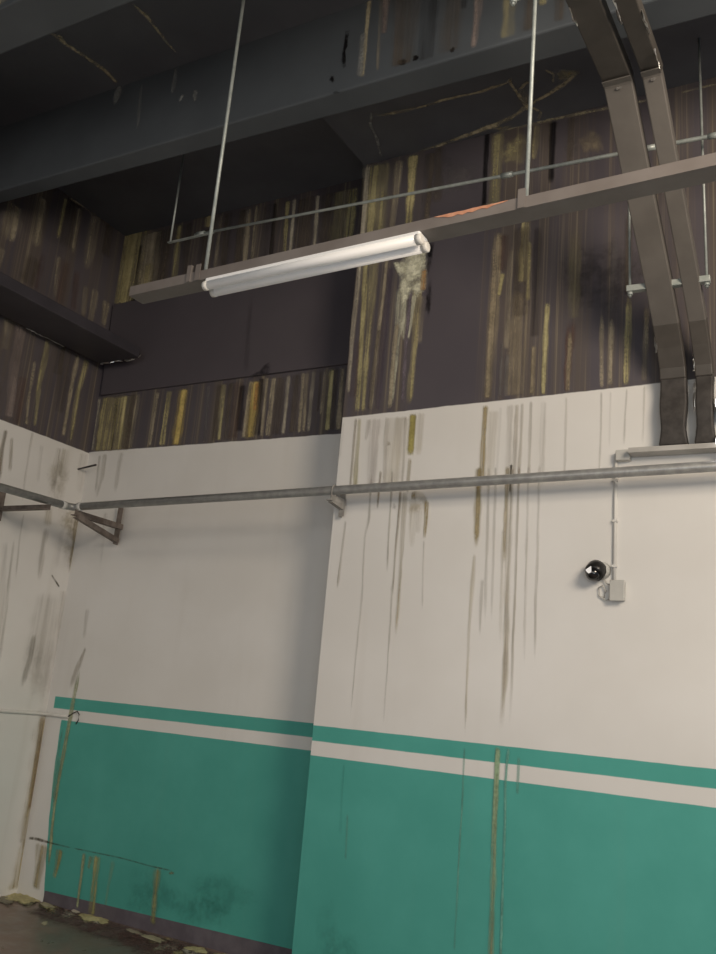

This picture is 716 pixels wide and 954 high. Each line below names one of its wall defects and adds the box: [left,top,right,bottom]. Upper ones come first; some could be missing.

crack [58,35,121,102]
crack [369,70,603,154]
damp [345,165,384,237]
damp [396,153,434,223]
damp [320,253,426,430]
damp [408,415,416,454]